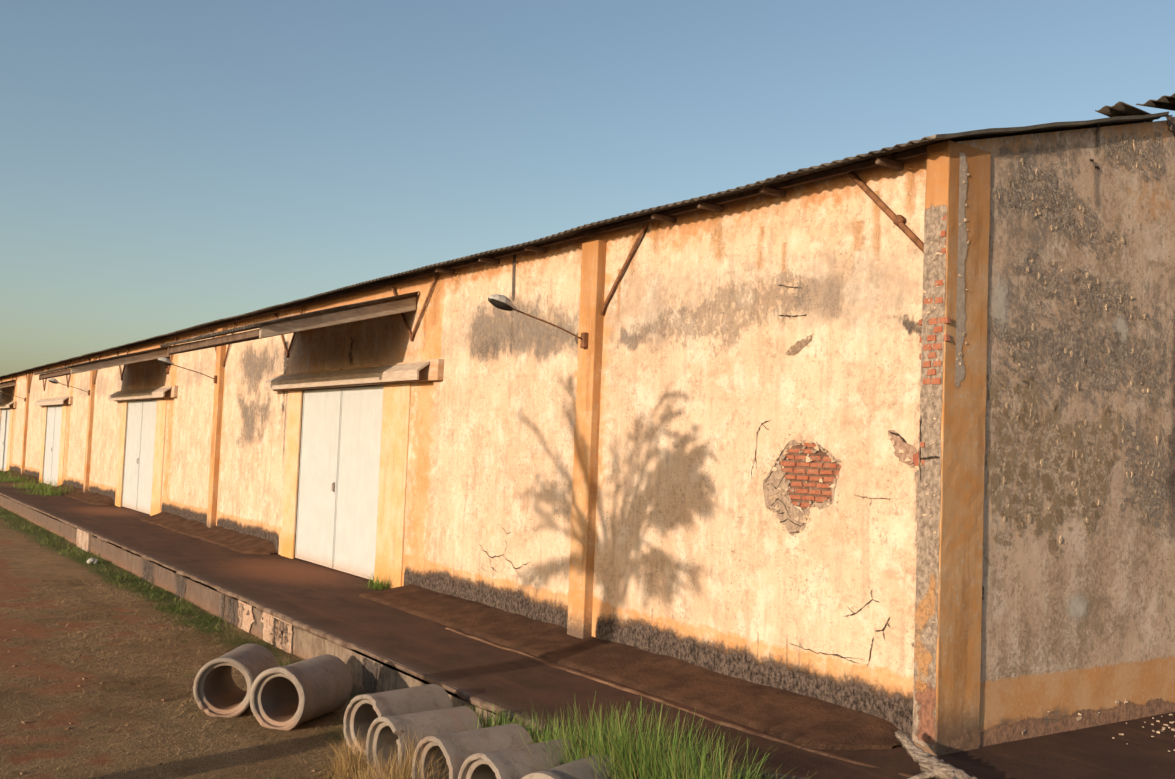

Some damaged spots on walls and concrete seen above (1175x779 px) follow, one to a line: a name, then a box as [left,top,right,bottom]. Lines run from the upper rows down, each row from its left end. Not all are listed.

peeling [1100,116,1175,181]
peeling [986,158,1174,558]
spalling [762,434,842,539]
spalling [887,152,969,749]
damp [1166,338,1175,536]
mould [404,565,568,629]
damp [595,607,913,740]